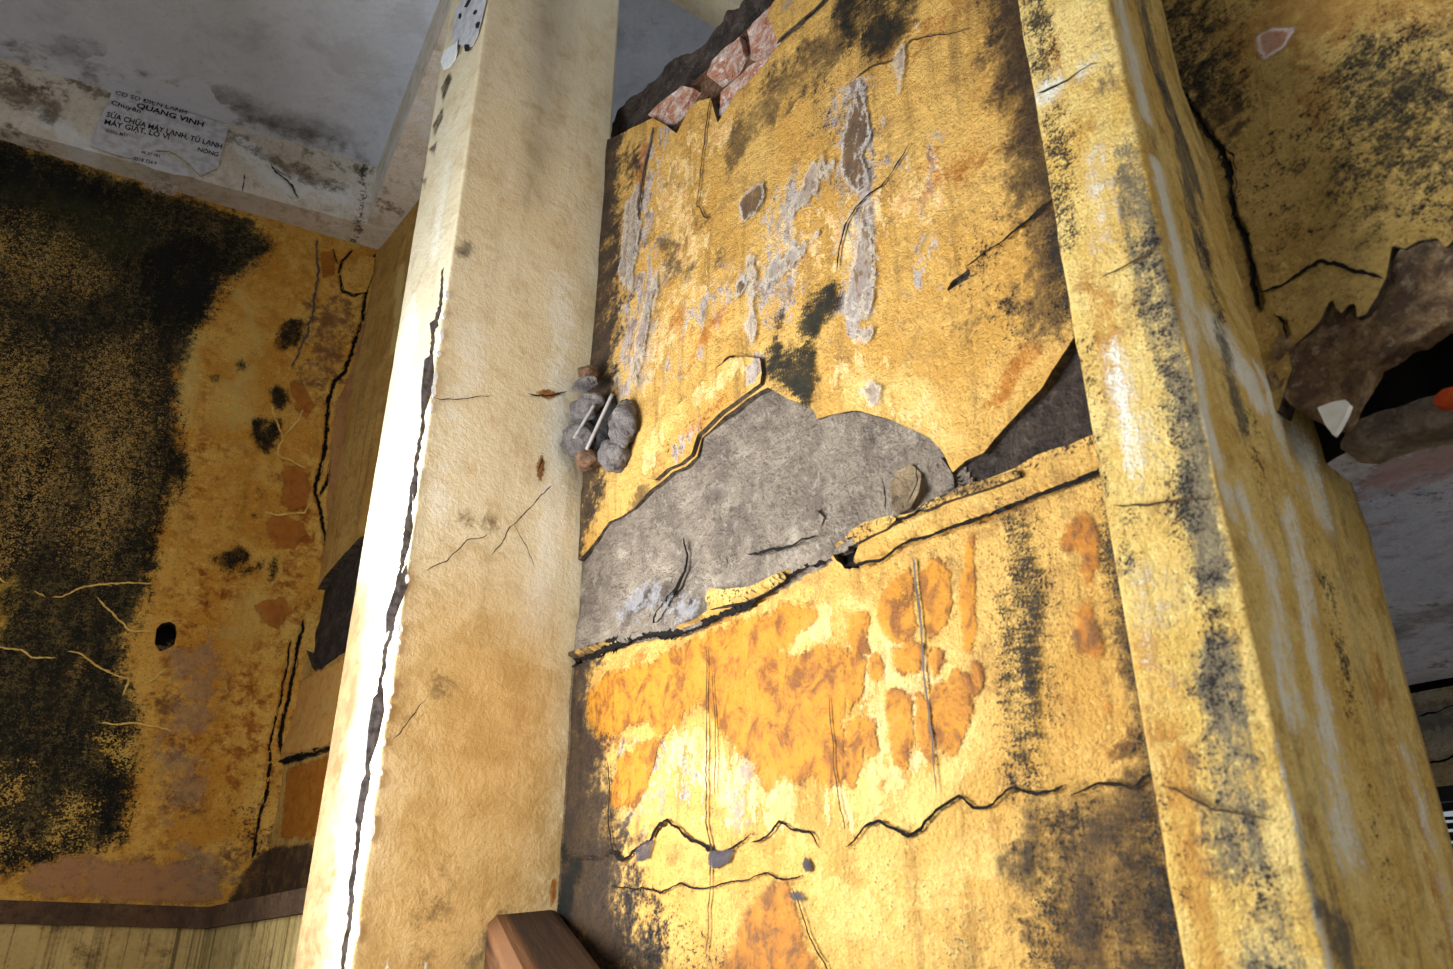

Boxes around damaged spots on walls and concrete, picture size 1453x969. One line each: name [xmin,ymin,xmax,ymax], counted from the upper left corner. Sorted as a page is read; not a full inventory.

leakage [1162,0,1262,135]
leakage [1308,10,1453,262]
leakage [0,140,365,905]
crack [252,620,330,858]
crack [291,240,376,546]
flaking render [314,541,364,671]
peeling [341,268,450,969]
corrosion [585,534,984,811]
flaking render [574,223,1093,663]
crack [572,466,1274,969]
leakage [989,477,1182,969]
flaking render [1267,241,1453,464]